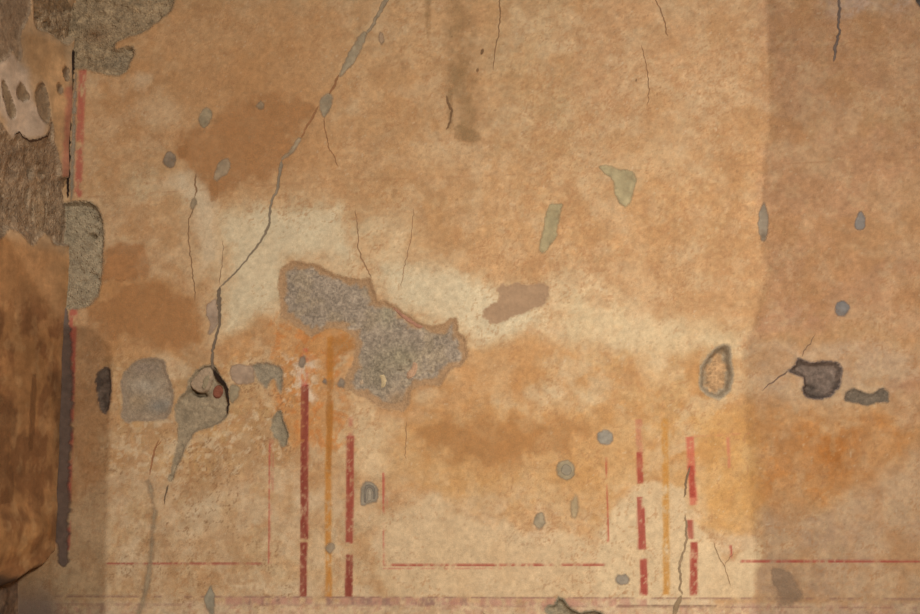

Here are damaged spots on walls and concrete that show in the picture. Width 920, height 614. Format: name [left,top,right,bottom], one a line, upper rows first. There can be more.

crack [366,0,389,33]
flaking render [0,0,176,310]
crack [301,75,339,164]
flaking render [94,356,231,483]
crack [188,161,283,413]
crack [355,213,371,276]
flaking render [276,260,469,413]
flaking render [481,281,550,325]
spalling [698,343,735,401]
spalling [786,357,891,407]
crack [673,467,690,614]
spalling [543,595,605,614]